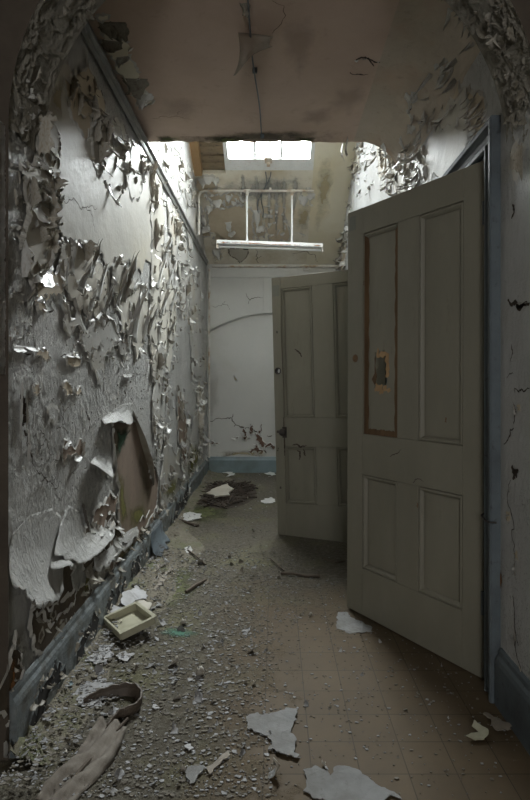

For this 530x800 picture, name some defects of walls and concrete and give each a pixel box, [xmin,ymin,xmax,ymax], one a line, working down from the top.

peeling [95,12,155,110]
crack [350,56,380,75]
peeling [453,0,516,82]
peeling [333,79,488,271]
crack [507,299,530,311]
peeling [0,54,306,759]
crack [504,344,530,444]
crack [507,465,519,577]